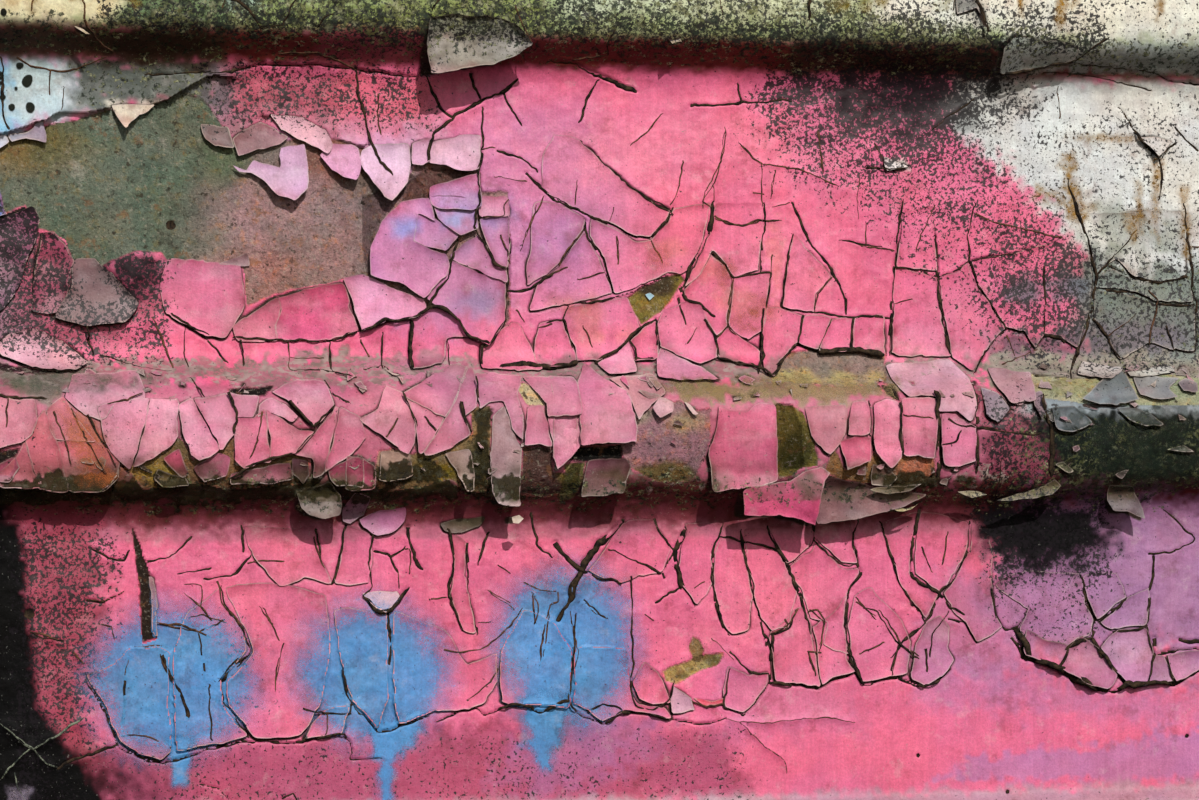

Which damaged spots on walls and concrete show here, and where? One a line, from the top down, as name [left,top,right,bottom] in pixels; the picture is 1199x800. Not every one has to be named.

crack [0,0,1199,500]
peeling [0,91,1199,689]
peeling [87,648,171,760]
peeling [145,526,349,749]
peeling [334,591,550,728]
crack [0,509,977,800]
peeling [551,635,768,721]
crack [991,509,1199,693]